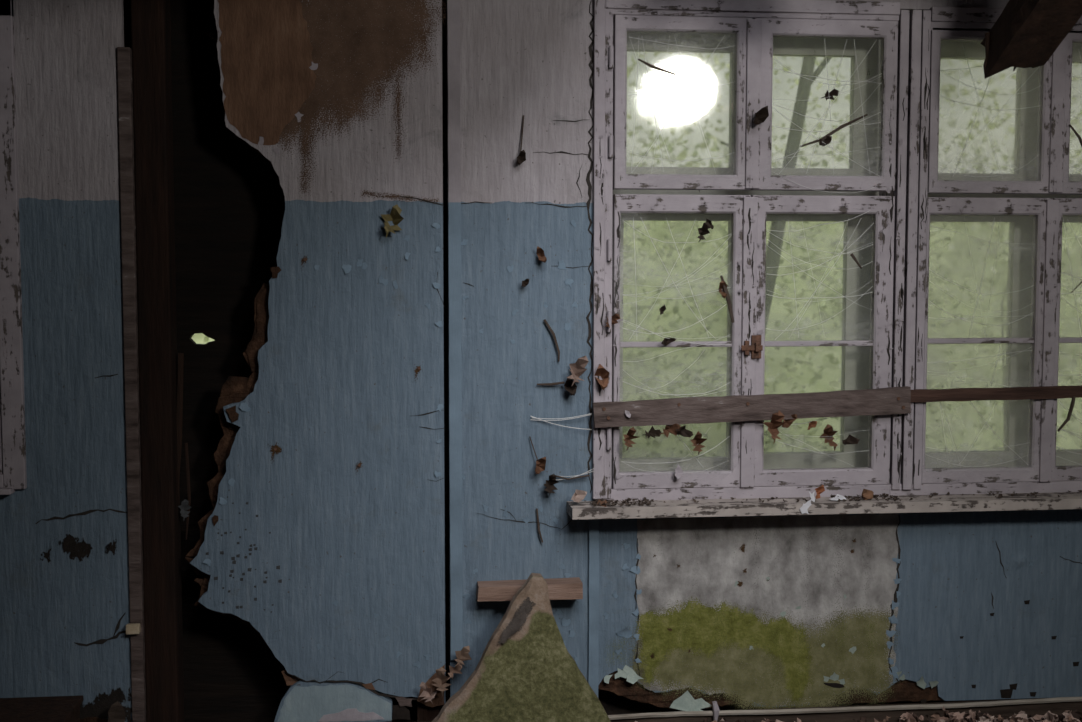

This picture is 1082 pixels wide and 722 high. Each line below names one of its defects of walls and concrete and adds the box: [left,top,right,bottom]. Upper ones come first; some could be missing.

peeling [882,70,930,222]
peeling [597,212,623,396]
peeling [738,208,764,341]
peeling [878,283,904,365]
spalling [177,266,282,655]
peeling [888,434,902,483]
spalling [281,669,301,686]
peeling [598,513,945,715]
peeling [1000,683,1018,698]